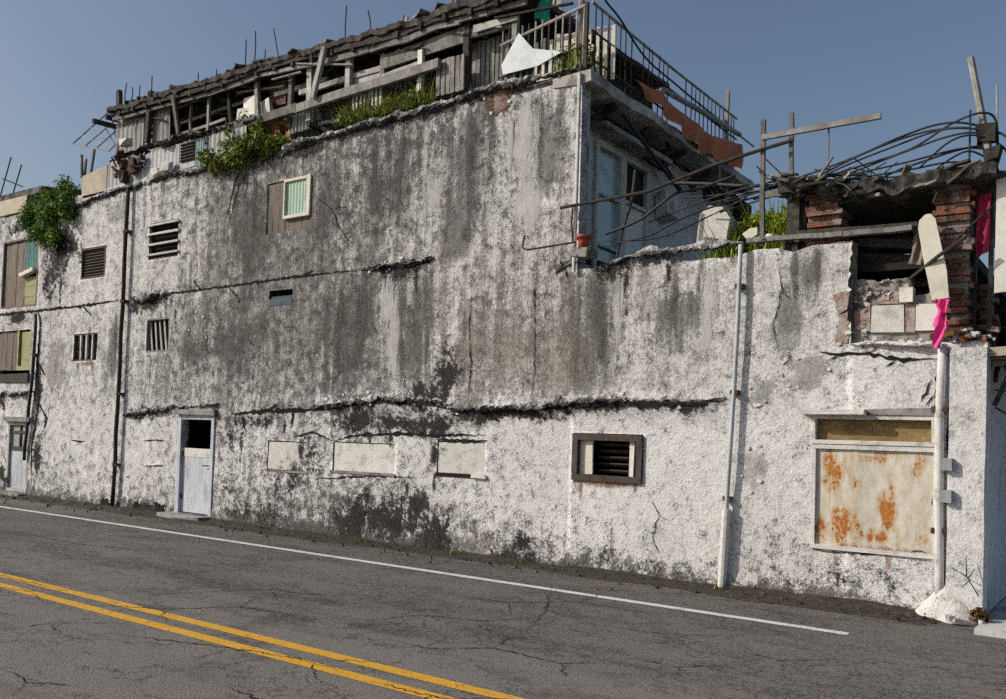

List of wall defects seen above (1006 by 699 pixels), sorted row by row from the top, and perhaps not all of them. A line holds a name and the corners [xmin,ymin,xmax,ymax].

leakage [409,145,443,221]
leakage [506,89,544,233]
leakage [379,264,428,379]
leakage [587,246,703,378]
crack [773,273,790,350]
peeling [832,288,878,348]
crack [822,242,949,455]
leakage [32,364,46,476]
leakage [218,412,324,527]
crack [231,404,483,441]
leakage [322,340,631,550]
leakage [646,399,727,417]